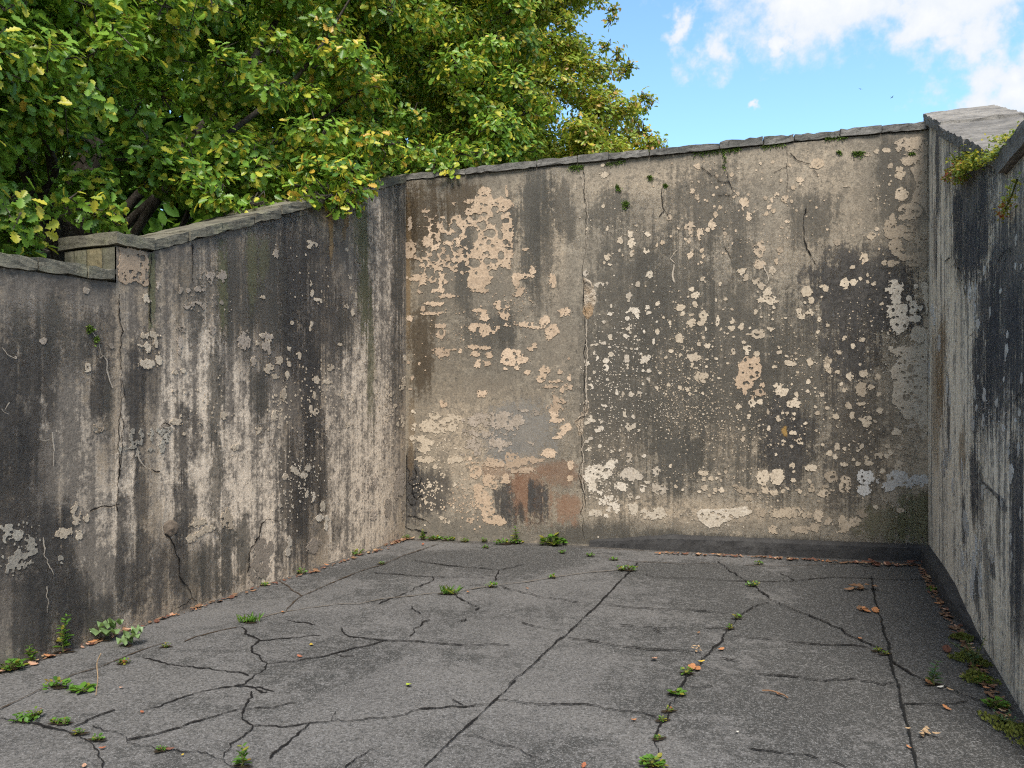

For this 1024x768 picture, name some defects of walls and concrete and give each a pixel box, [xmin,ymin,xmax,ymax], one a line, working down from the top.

peeling [0,516,41,576]
crack [43,537,54,608]
peeling [117,246,232,336]
crack [247,519,277,573]
damp [207,216,324,453]
peeling [236,330,355,583]
crack [0,560,980,768]
crack [578,167,589,539]
peeling [355,137,941,535]
damp [756,395,812,495]
damp [797,243,925,387]
damp [935,136,1024,646]